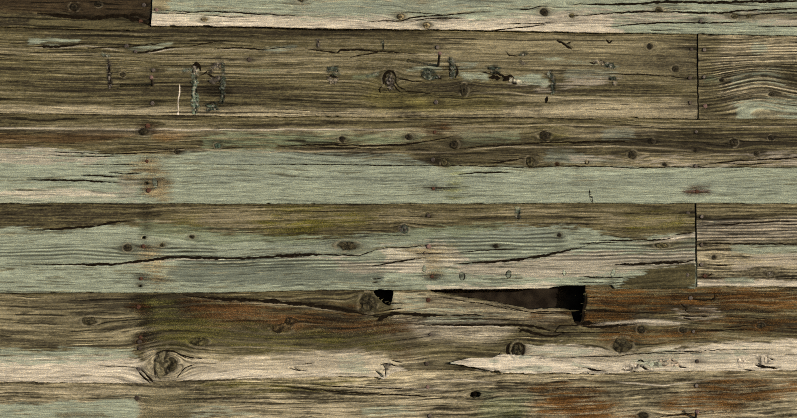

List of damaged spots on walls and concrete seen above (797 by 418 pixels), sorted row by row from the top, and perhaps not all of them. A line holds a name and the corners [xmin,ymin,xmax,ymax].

crack [25,220,797,283]
crack [183,260,778,389]
crack [99,350,202,383]